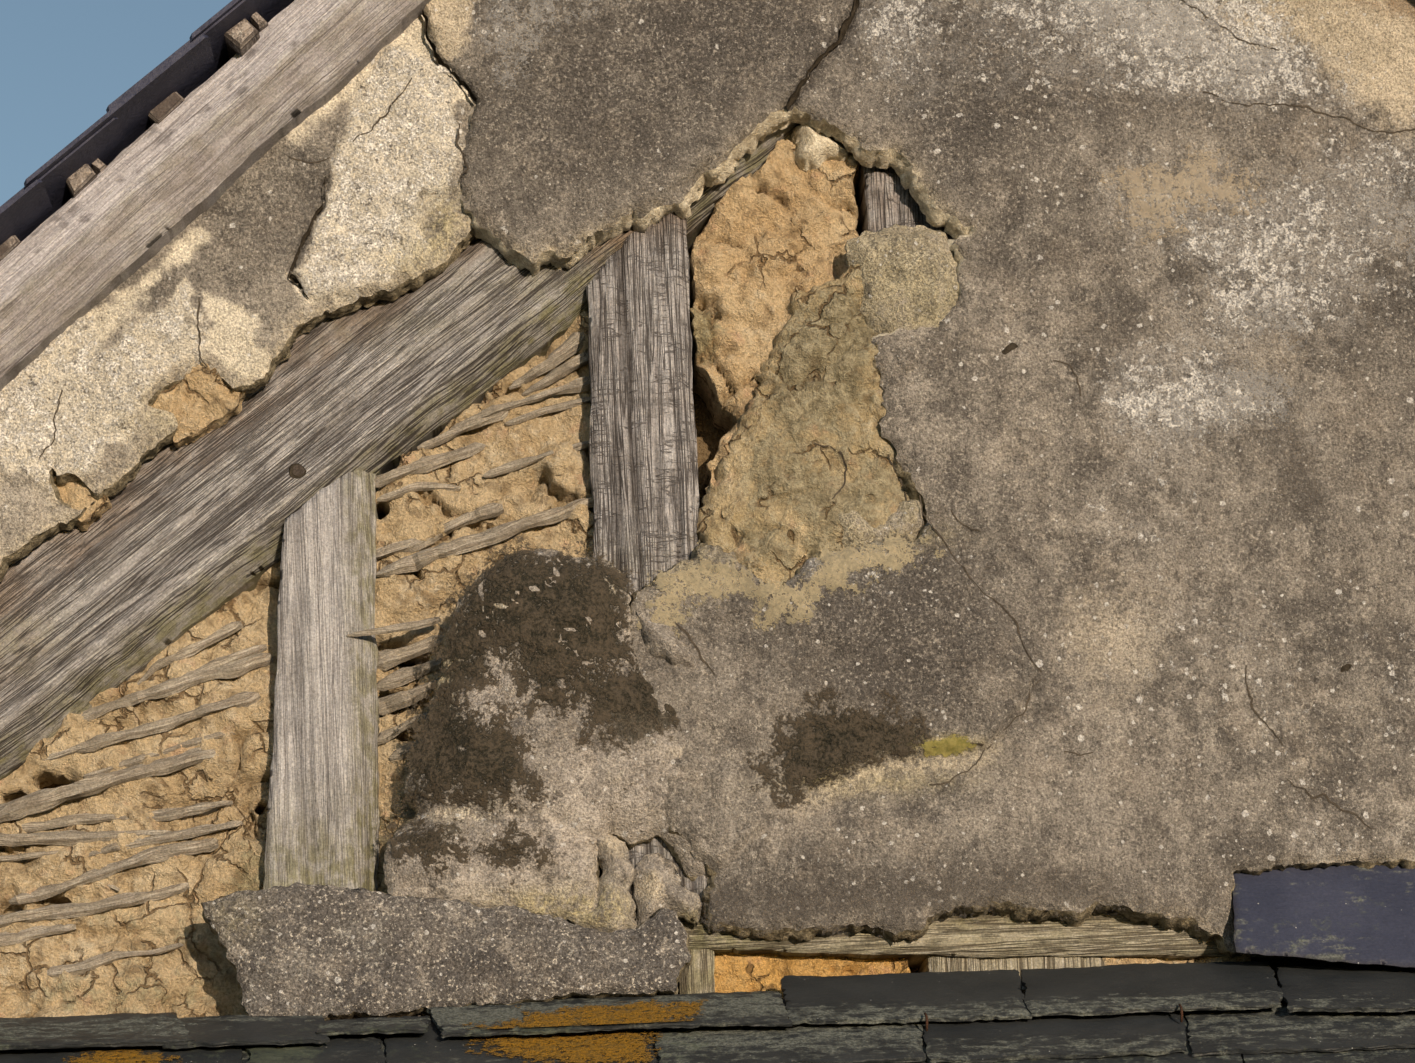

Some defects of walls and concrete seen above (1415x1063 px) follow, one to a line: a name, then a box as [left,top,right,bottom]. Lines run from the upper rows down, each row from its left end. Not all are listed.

crack [787,0,859,110]
crack [1181,0,1279,50]
crack [288,9,477,299]
crack [1203,91,1415,133]
spalling [459,106,976,589]
spalling [152,362,246,448]
spalling [53,476,112,531]
crack [814,443,847,499]
crack [888,454,1042,785]
leakage [380,528,946,885]